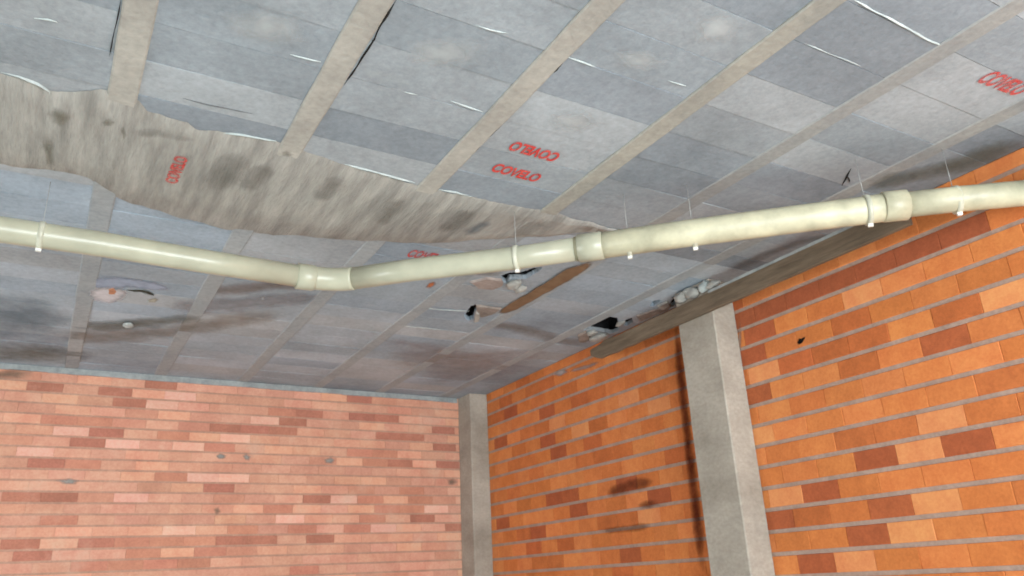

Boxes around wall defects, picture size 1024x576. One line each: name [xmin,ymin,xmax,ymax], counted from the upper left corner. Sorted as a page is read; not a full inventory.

flaking render [92,277,166,303]
damp [206,296,307,310]
spalling [466,304,501,323]
spalling [470,268,536,294]
spalling [578,296,674,343]